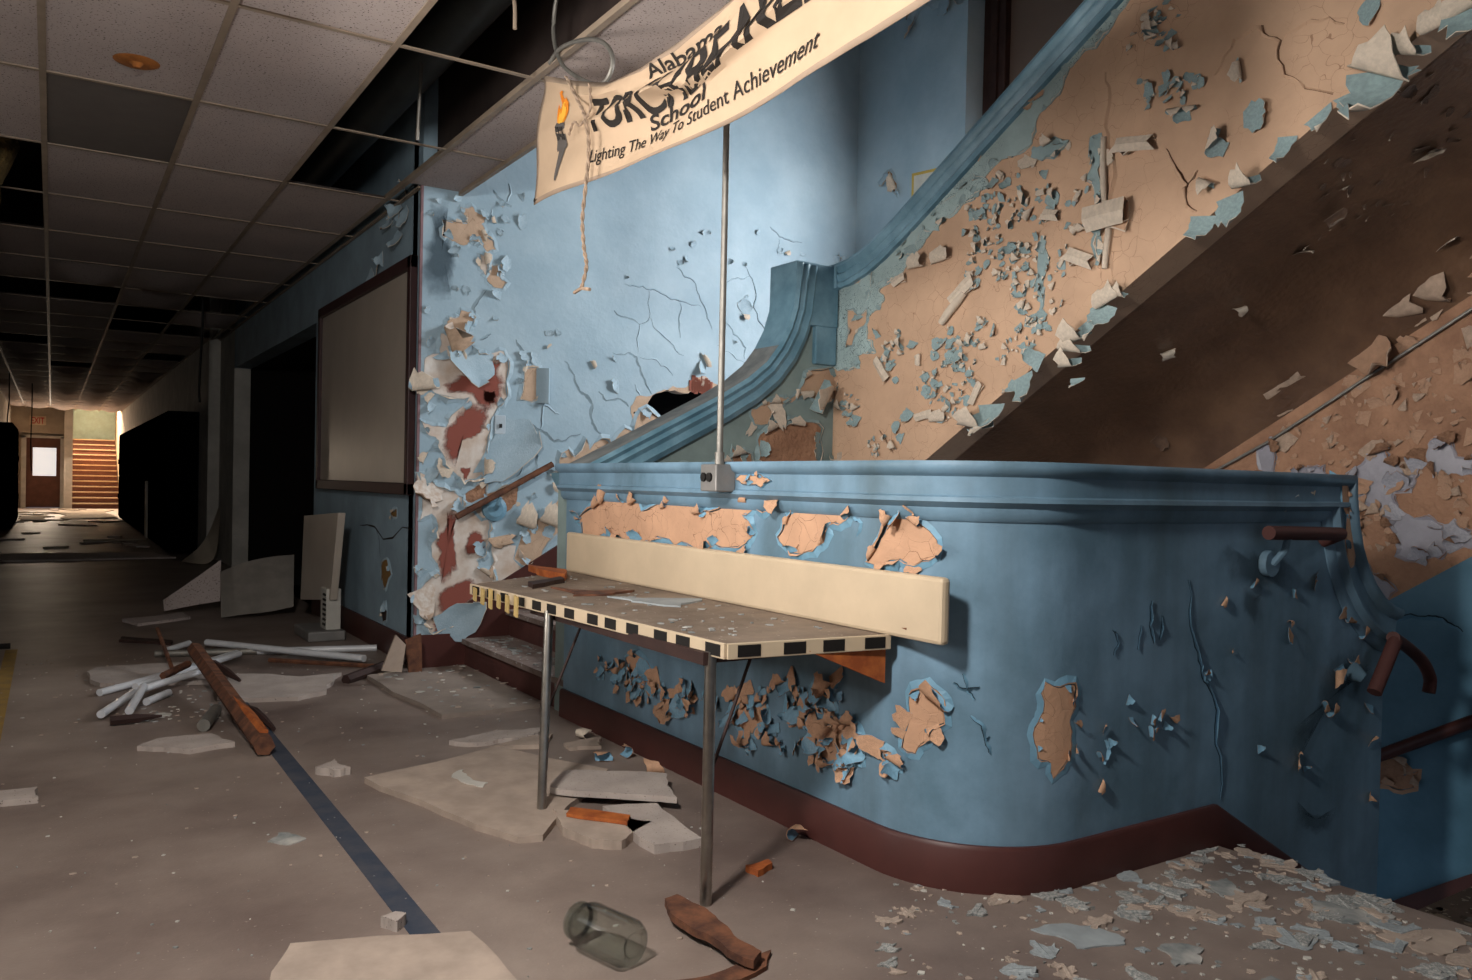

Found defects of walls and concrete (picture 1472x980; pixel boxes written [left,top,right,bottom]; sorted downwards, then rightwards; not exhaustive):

peeling [1243,98,1266,133]
crack [1214,16,1345,95]
peeling [1269,0,1472,163]
peeling [366,179,409,281]
peeling [1183,125,1261,240]
crack [517,227,802,479]
peeling [379,557,393,626]
crack [1112,581,1223,799]
peeling [1322,606,1370,717]
crack [1103,739,1111,765]
peeling [1369,756,1422,802]